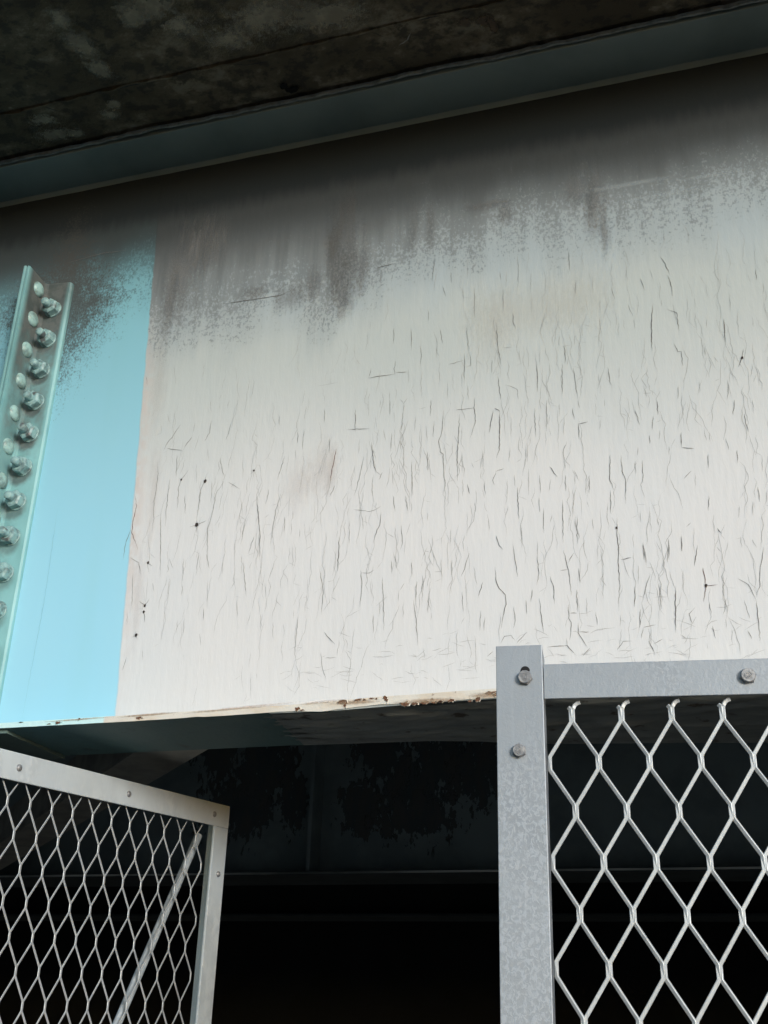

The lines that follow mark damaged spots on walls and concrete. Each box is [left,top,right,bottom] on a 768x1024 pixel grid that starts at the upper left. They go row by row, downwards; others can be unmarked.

crack [123,228,768,704]